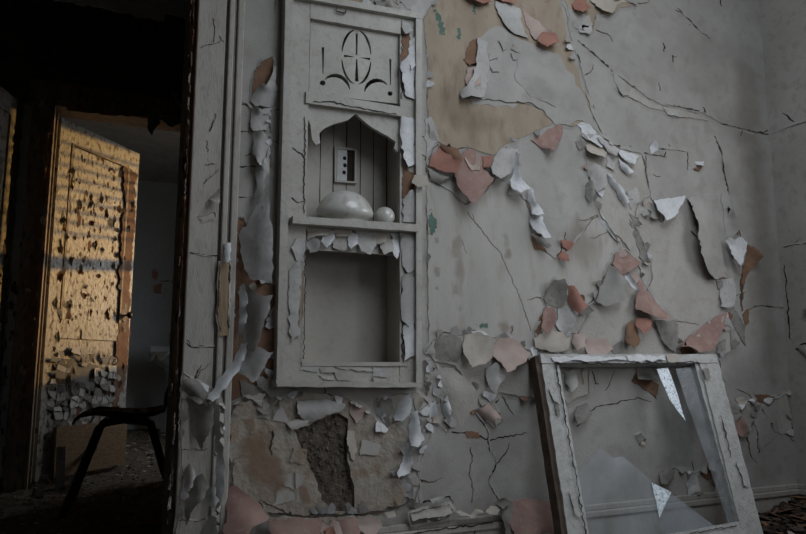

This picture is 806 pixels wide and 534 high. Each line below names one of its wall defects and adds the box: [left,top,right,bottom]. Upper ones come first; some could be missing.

peeling [18,113,52,471]
peeling [47,154,138,428]
peeling [66,91,182,135]
peeling [170,0,745,534]
crack [558,0,806,356]
crack [259,395,532,518]
crack [413,522,493,534]